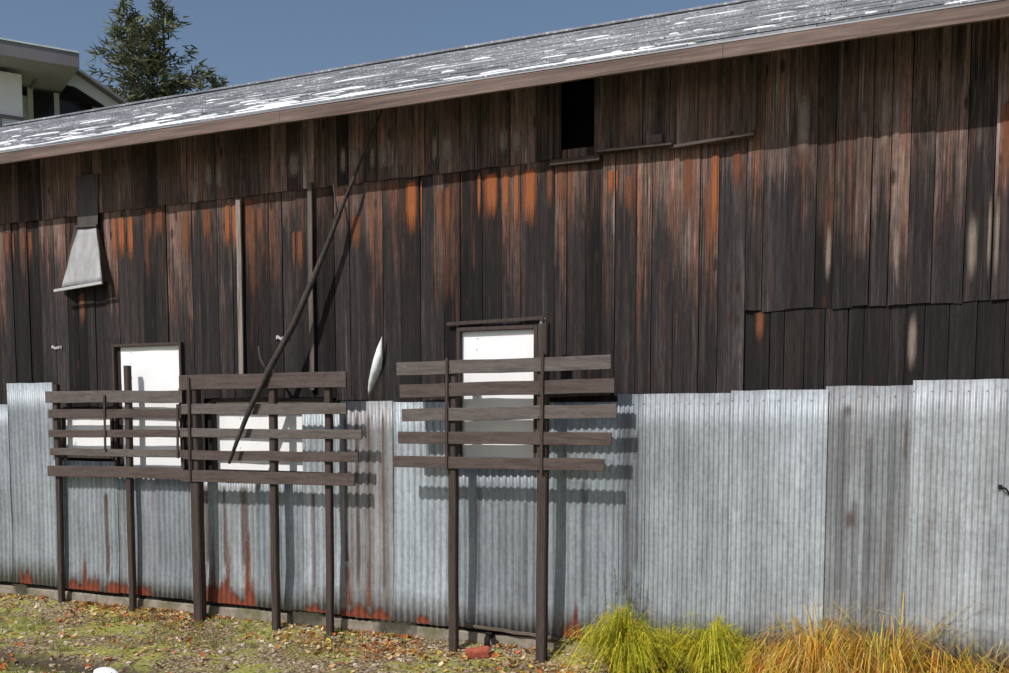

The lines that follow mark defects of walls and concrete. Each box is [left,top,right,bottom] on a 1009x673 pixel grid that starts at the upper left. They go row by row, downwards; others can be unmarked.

rust [69,562,152,596]
rust [206,543,255,606]
rust [342,571,390,620]